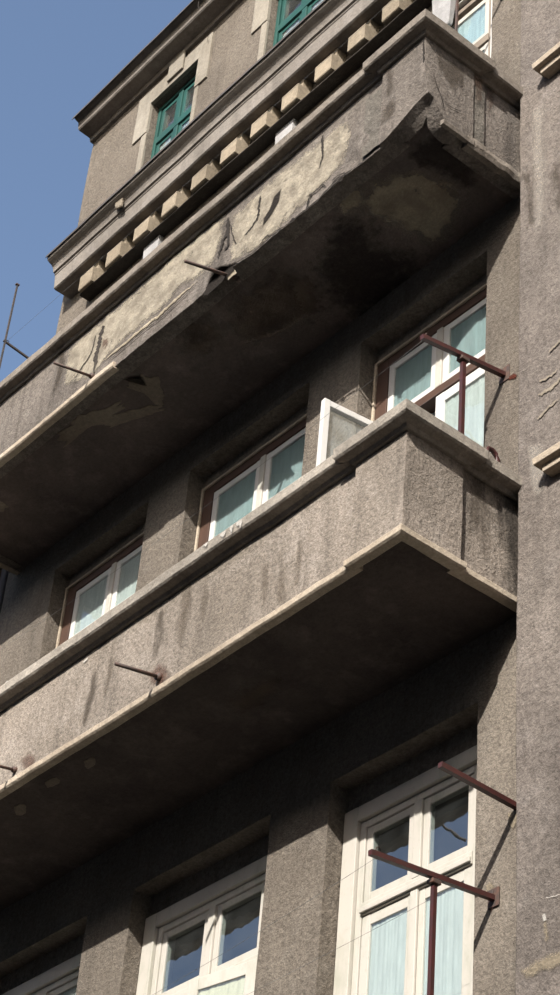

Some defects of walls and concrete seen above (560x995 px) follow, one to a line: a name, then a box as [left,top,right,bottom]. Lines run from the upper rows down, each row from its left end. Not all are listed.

crack [422,41,463,112]
leakage [412,139,471,184]
crack [218,135,373,263]
crack [75,326,105,378]